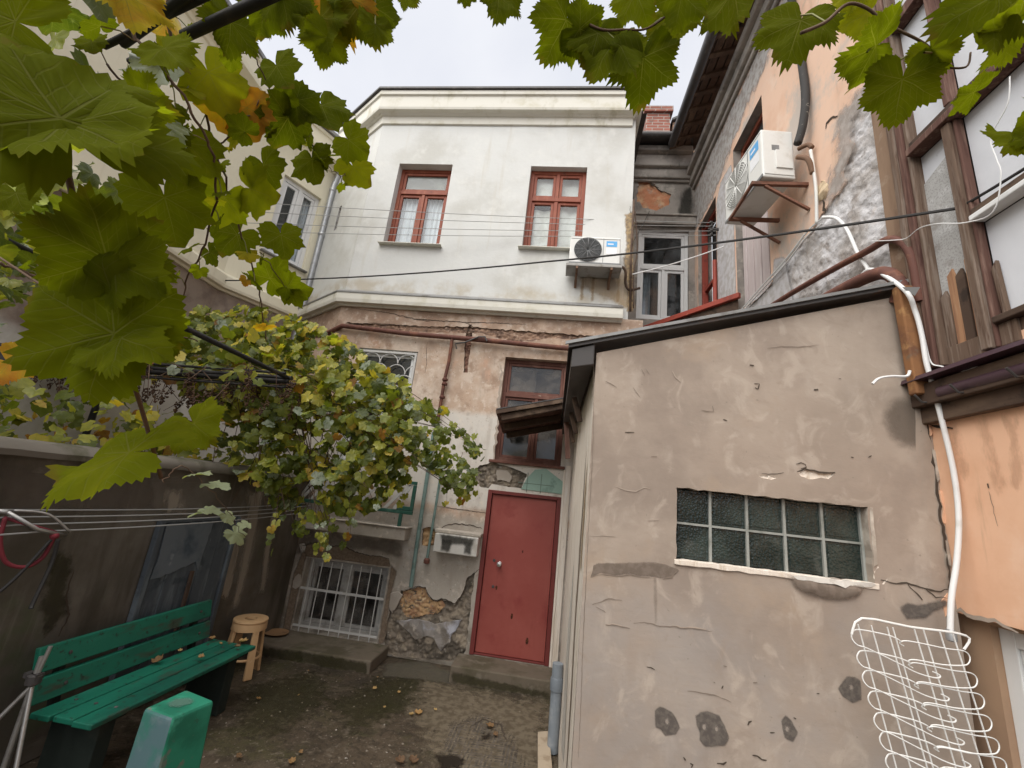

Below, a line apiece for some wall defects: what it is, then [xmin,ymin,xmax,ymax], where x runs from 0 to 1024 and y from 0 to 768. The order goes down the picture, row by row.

flaking render [624,182,671,311]
flaking render [476,365,527,488]
flaking render [797,462,835,479]
crack [882,425,1019,634]
flaking render [299,542,479,660]
water stain [839,677,861,703]
water stain [655,707,679,735]
water stain [696,711,729,746]
water stain [782,716,797,741]